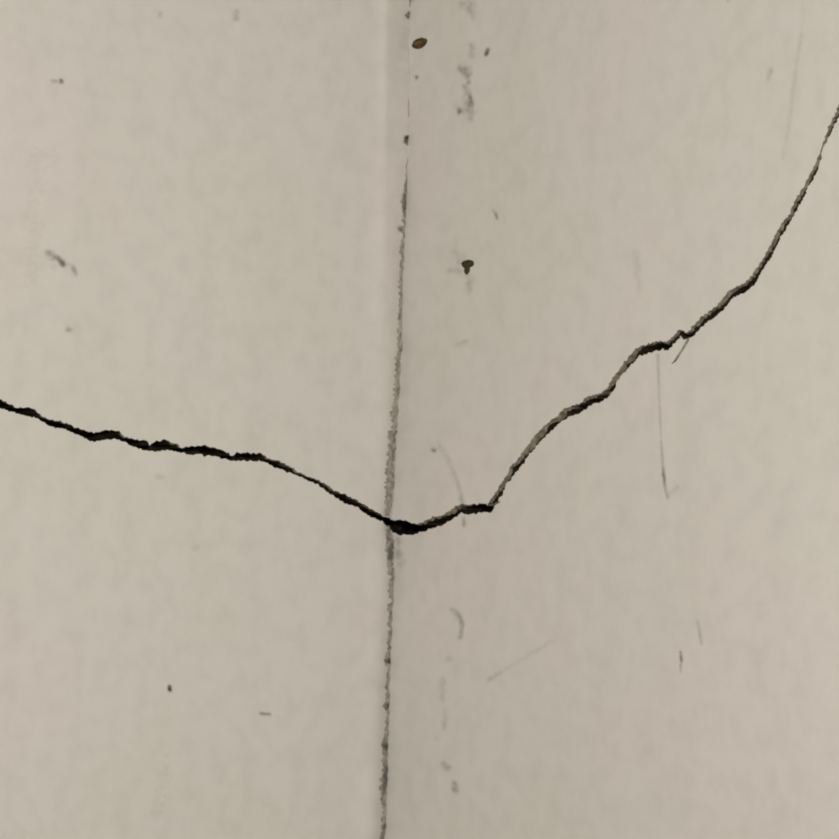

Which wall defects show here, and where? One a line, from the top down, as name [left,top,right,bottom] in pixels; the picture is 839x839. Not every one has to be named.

crack [0,105,839,536]
crack [379,529,395,839]